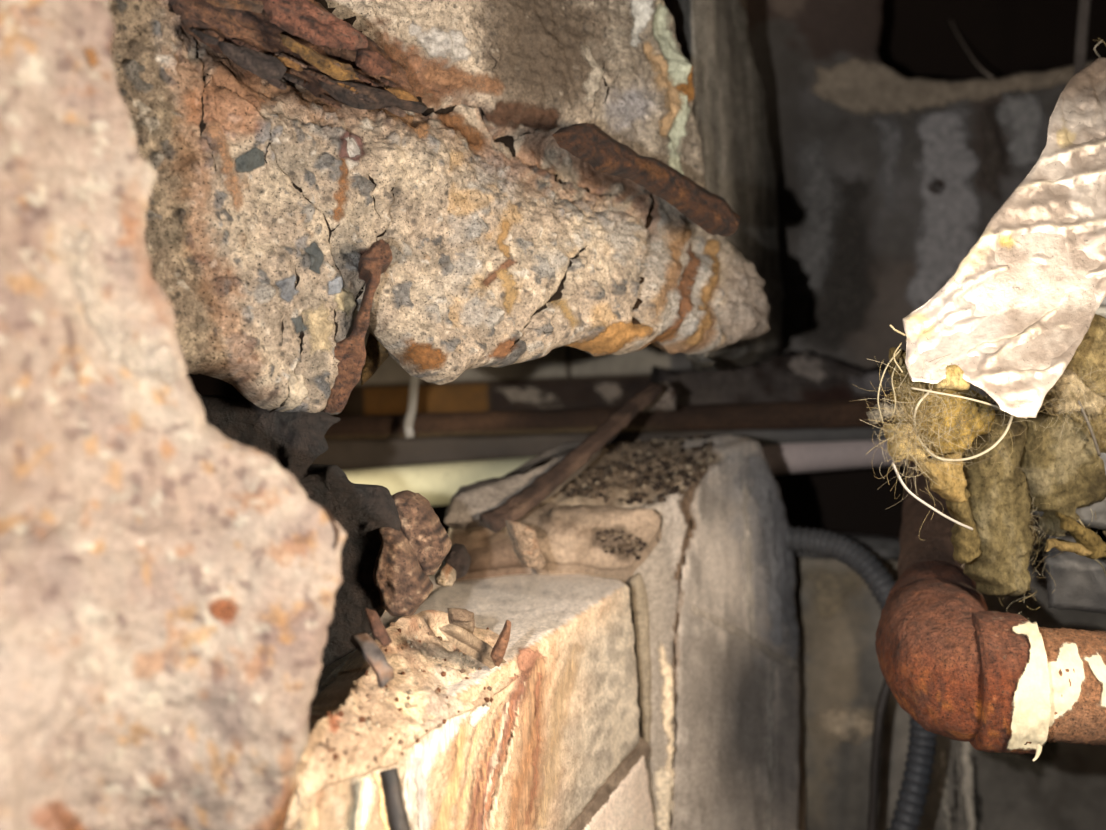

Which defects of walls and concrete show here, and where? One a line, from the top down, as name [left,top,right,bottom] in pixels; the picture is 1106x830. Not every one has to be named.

peeling [204,0,368,51]
corrosion [207,52,337,112]
crack [417,96,534,157]
spalling [235,147,265,173]
corrosion [374,21,741,358]
crack [645,202,654,230]
spalling [292,241,356,351]
crack [512,245,588,347]
crack [632,277,644,324]
corrosion [479,382,663,533]
peeling [448,608,475,634]
corrosion [437,648,575,830]